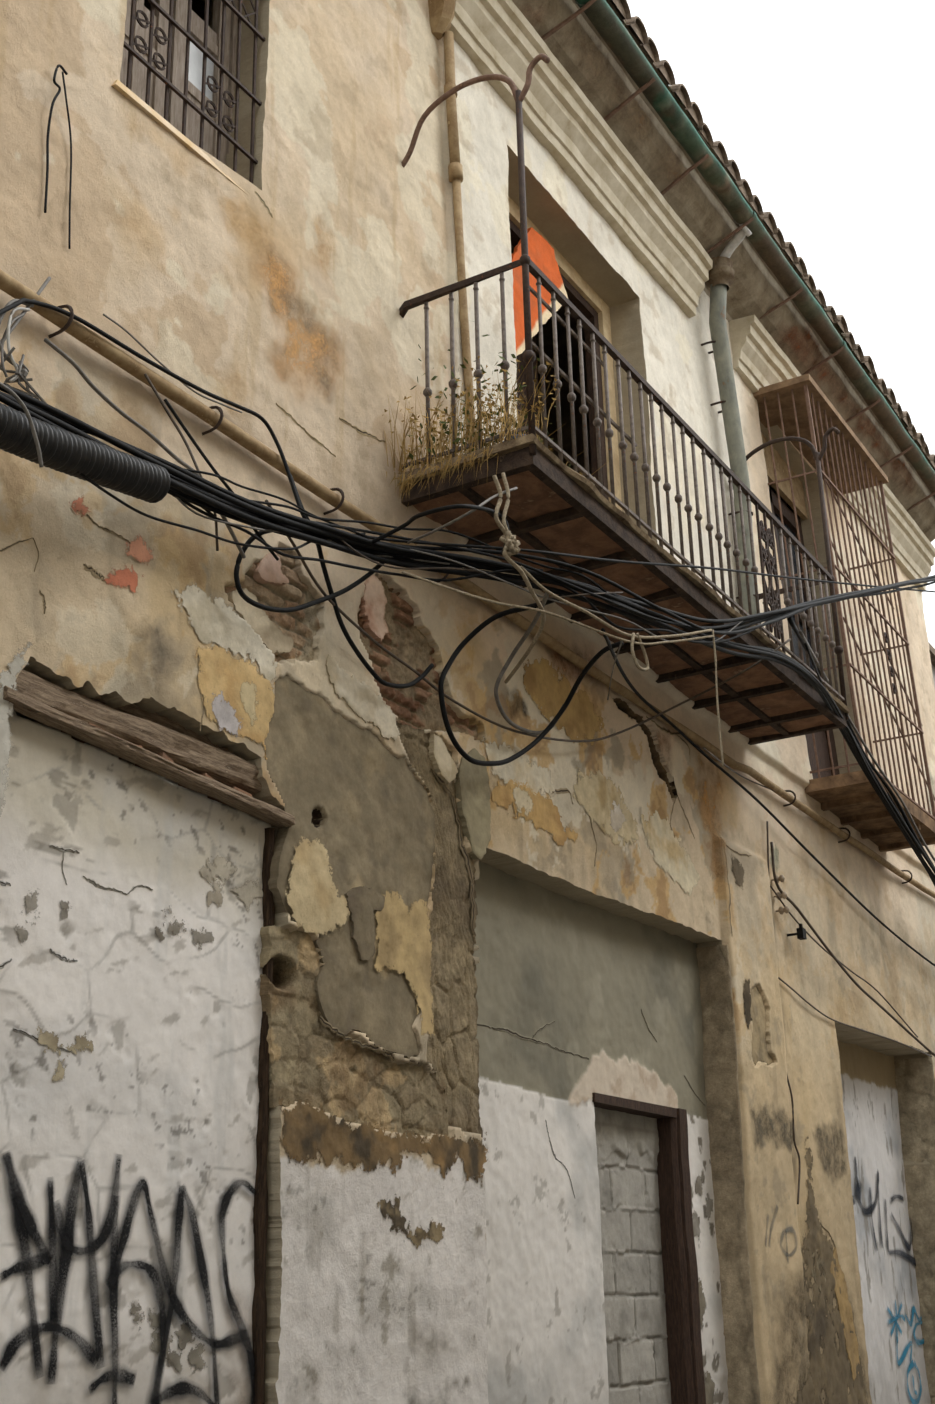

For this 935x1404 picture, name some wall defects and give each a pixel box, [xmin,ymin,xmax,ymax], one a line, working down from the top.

peeling [69,495,91,517]
peeling [104,534,153,593]
peeling [523,658,674,798]
peeling [573,767,700,896]
crack [50,845,153,895]
peeling [171,547,578,1190]
peeling [731,853,745,888]
crack [50,948,78,963]
crack [13,1027,72,1053]
crack [477,1021,589,1060]
spalling [743,979,774,1065]
peeling [377,1194,445,1249]